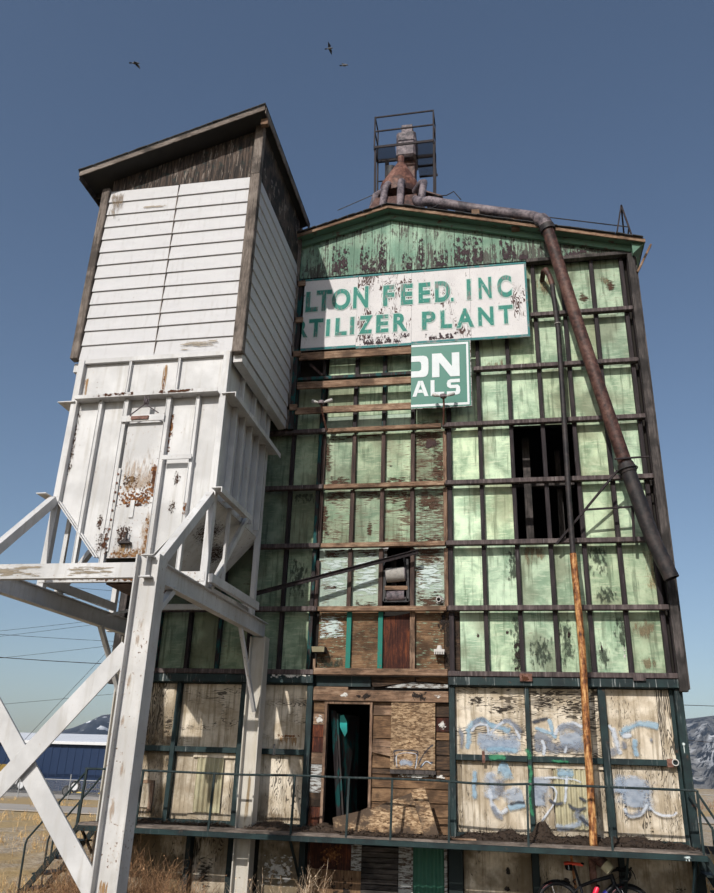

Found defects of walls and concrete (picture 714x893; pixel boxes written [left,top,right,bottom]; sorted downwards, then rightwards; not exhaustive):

peeling [331,246,349,275]
peeling [360,241,387,273]
peeling [402,235,484,269]
peeling [499,236,529,260]
rust [159,365,193,393]
rust [118,464,157,507]
rust [95,515,150,558]
peeling [320,617,344,638]
peeling [262,854,293,886]